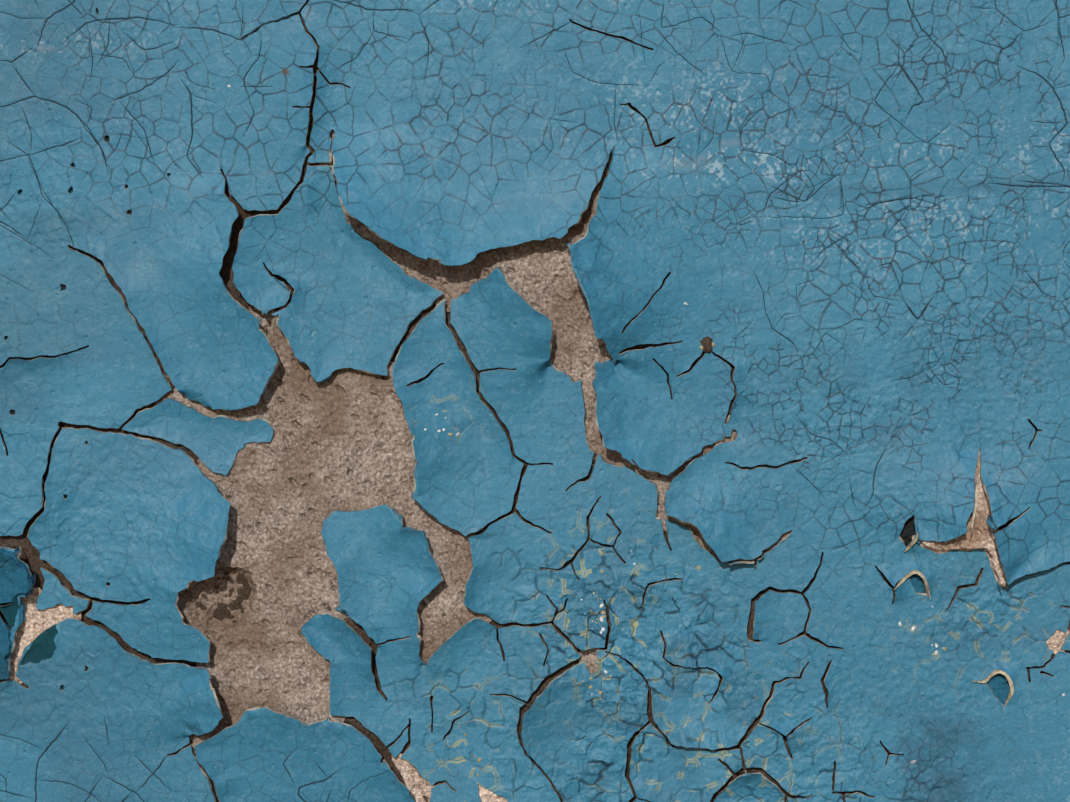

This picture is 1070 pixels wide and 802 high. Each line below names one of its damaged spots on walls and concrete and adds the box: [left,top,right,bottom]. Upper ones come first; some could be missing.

crack [956,0,1070,212]
crack [522,0,958,417]
crack [0,0,439,664]
crack [327,606,406,699]
crack [283,695,469,802]
peeling [0,103,812,802]
crack [383,301,553,535]
crack [660,630,723,701]
crack [947,568,983,609]
peeling [893,449,1070,647]
spalling [972,669,1014,707]
crack [1025,605,1070,679]